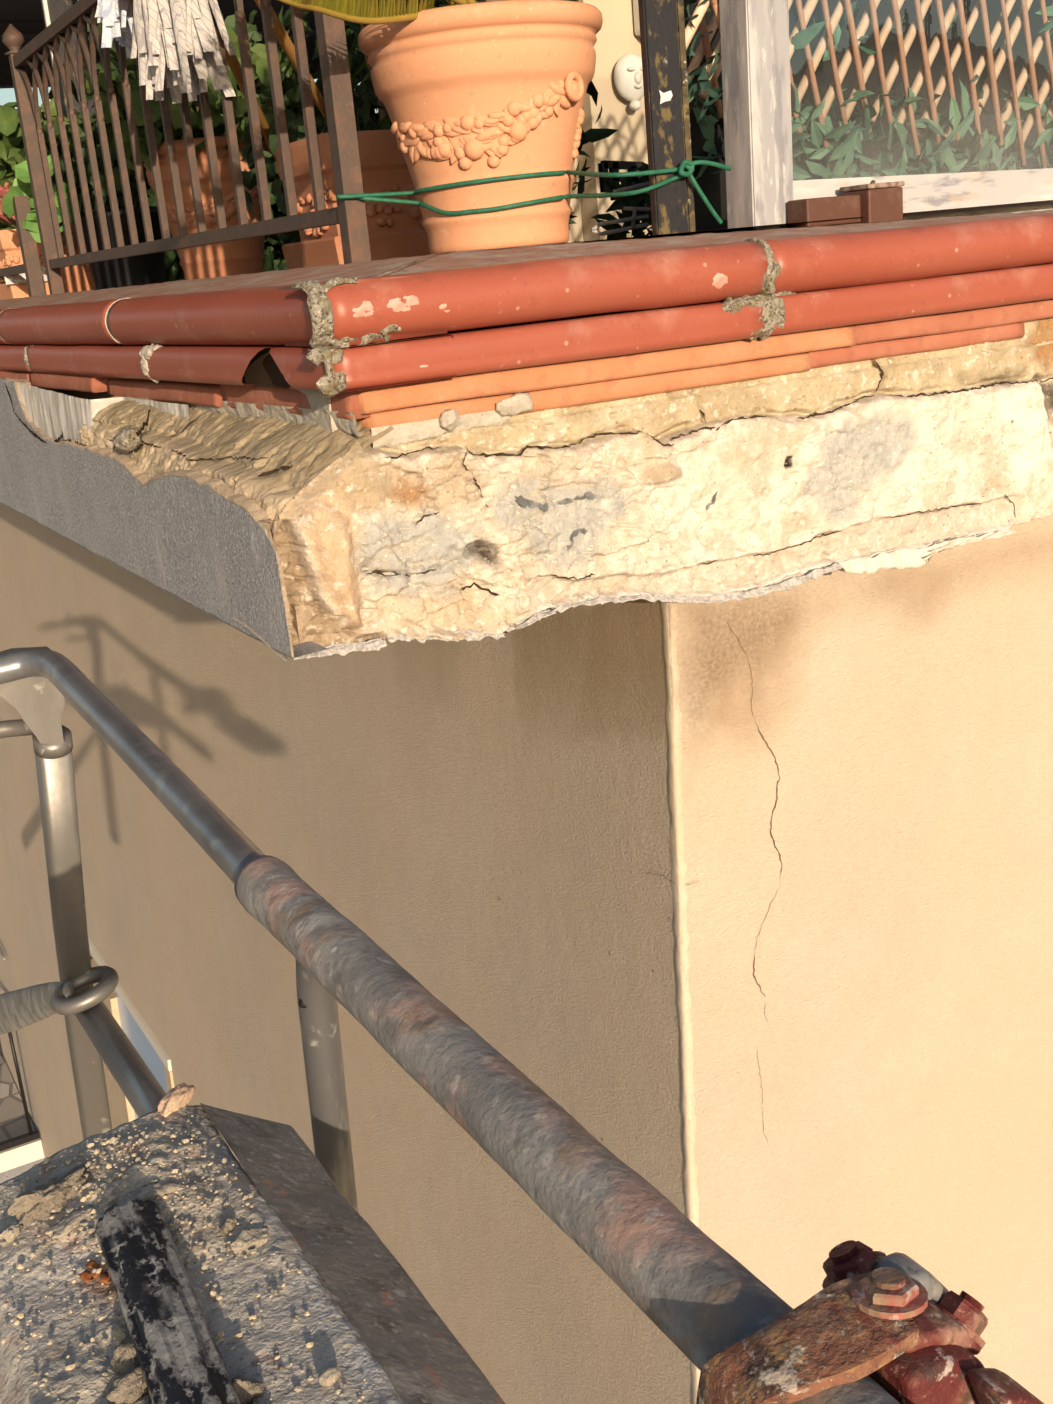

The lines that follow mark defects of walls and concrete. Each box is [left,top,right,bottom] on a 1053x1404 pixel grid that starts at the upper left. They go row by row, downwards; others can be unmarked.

spalling [19,317,1053,662]
crack [385,360,1053,507]
crack [728,624,782,1139]